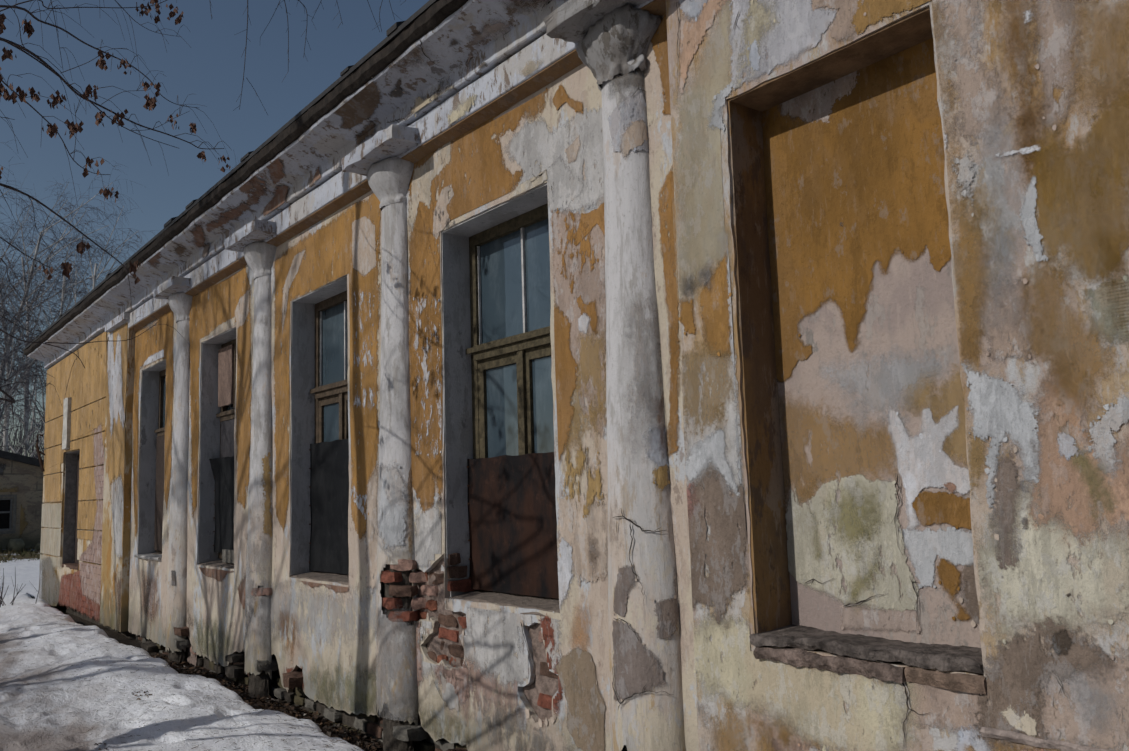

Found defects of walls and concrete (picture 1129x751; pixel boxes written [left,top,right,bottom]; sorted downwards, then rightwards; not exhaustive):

peeling [651,0,1005,382]
water stain [1005,0,1129,395]
peeling [44,310,174,621]
water stain [315,669,377,711]
peeling [174,77,665,751]
crack [613,510,665,640]
water stain [833,494,877,541]
peeling [647,165,1129,751]
crack [902,682,928,739]